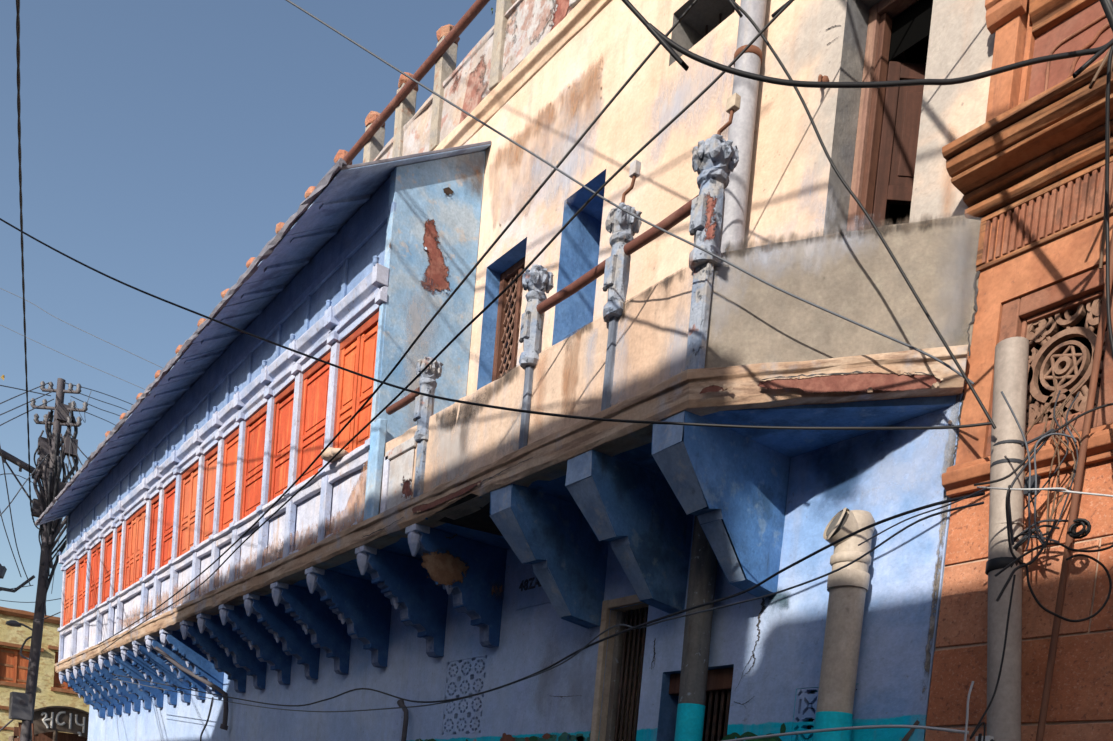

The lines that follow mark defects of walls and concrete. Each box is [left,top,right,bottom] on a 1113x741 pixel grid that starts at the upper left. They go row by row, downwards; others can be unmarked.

peeling [502,0,571,71]
peeling [453,55,489,124]
peeling [420,219,450,294]
peeling [704,192,718,241]
water stain [725,233,819,262]
water stain [859,216,964,234]
peeling [757,371,943,393]
water stain [811,426,897,496]
spalling [421,549,469,586]
crack [734,598,766,708]